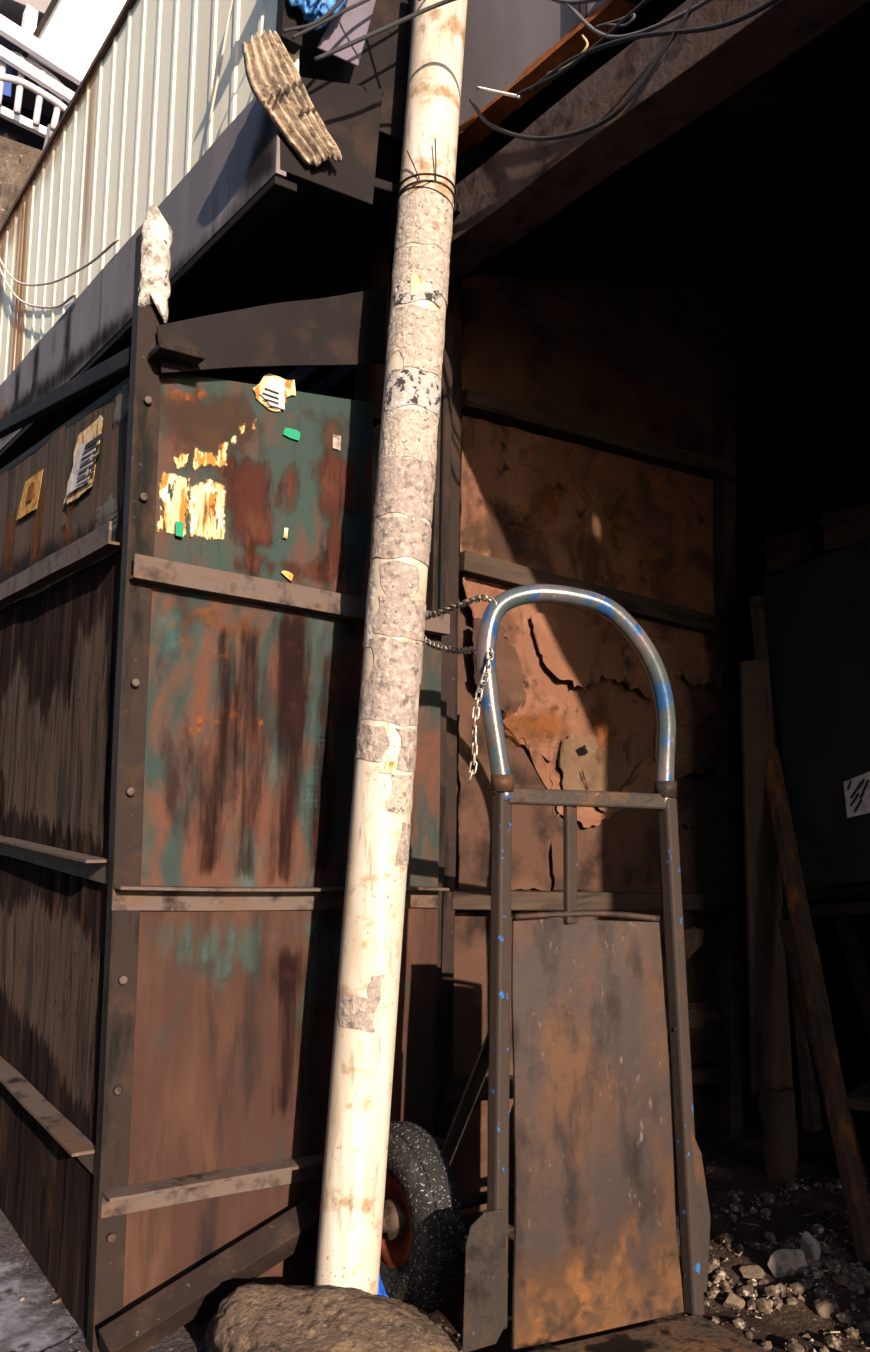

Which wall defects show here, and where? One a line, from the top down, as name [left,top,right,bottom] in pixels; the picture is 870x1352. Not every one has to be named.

rust [85,86,93,213]
rust [0,194,28,376]
rust [160,390,360,581]
rust [201,624,258,874]
rust [278,615,333,881]
peeling [463,574,512,686]
peeling [495,603,657,793]
peeling [556,806,623,828]
peeling [632,616,724,781]